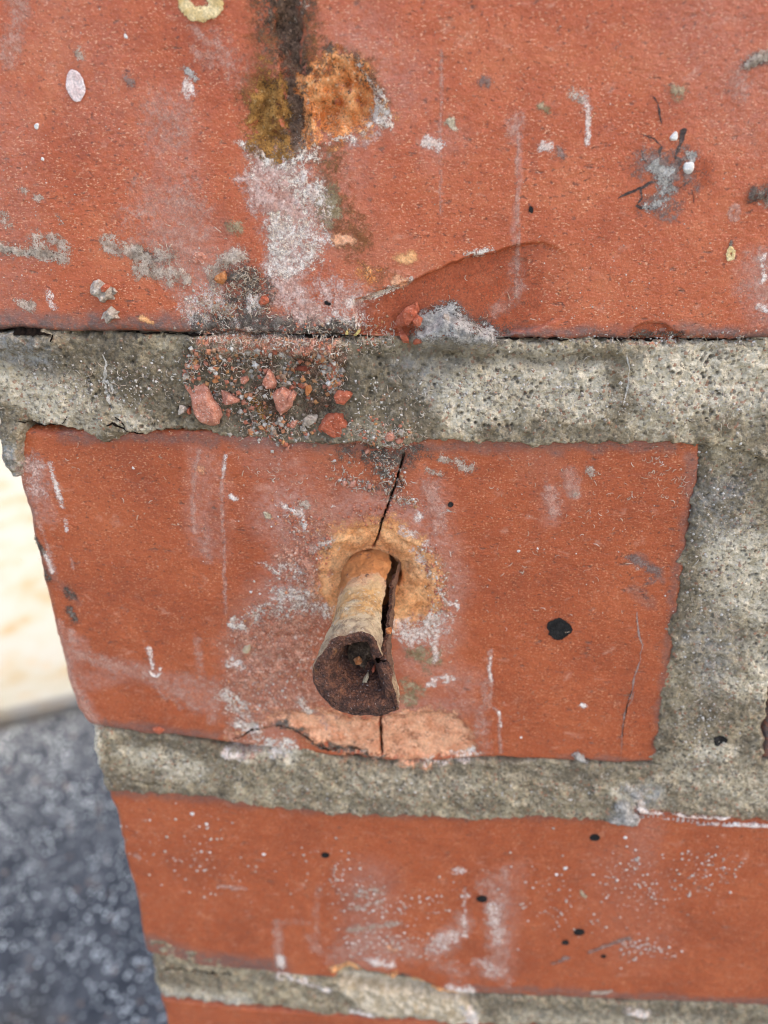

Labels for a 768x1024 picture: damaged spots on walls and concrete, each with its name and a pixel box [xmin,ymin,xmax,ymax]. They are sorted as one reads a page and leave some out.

rust [240,0,396,288]
damp [120,138,383,367]
spalling [355,247,543,345]
spalling [185,378,240,426]
spalling [262,369,312,416]
spalling [318,390,353,438]
crack [374,454,404,545]
spalling [214,500,481,770]
crack [232,716,383,761]